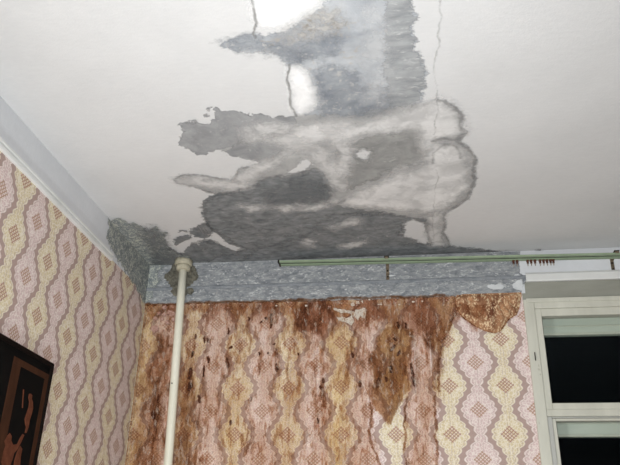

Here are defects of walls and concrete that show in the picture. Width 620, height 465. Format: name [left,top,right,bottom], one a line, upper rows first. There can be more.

crack [286,65,297,117]
water stain [106,0,498,317]
water stain [258,298,307,328]
peeling [145,251,526,326]